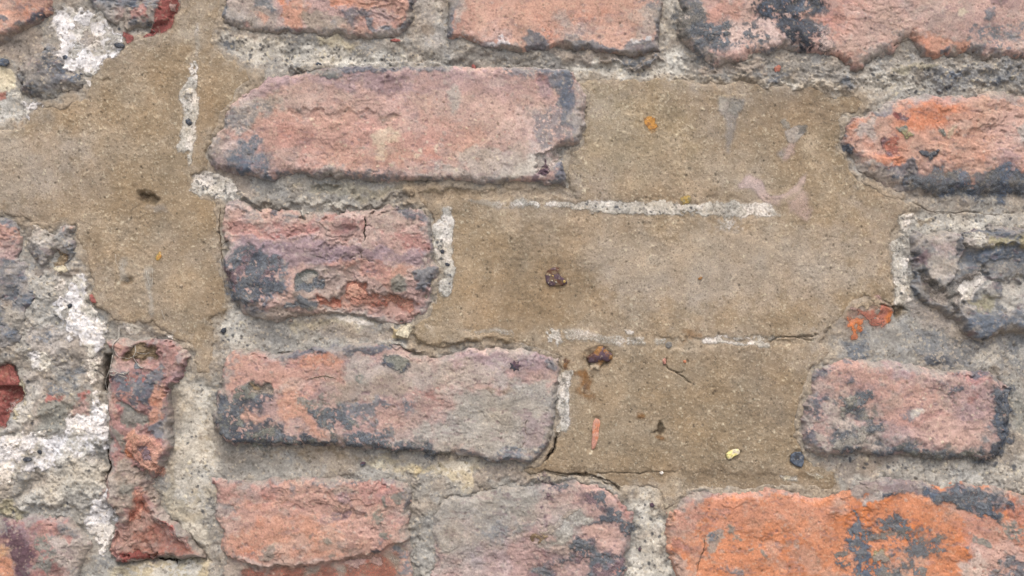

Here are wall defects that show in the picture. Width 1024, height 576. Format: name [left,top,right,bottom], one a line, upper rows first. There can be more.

crack [545,436,671,487]